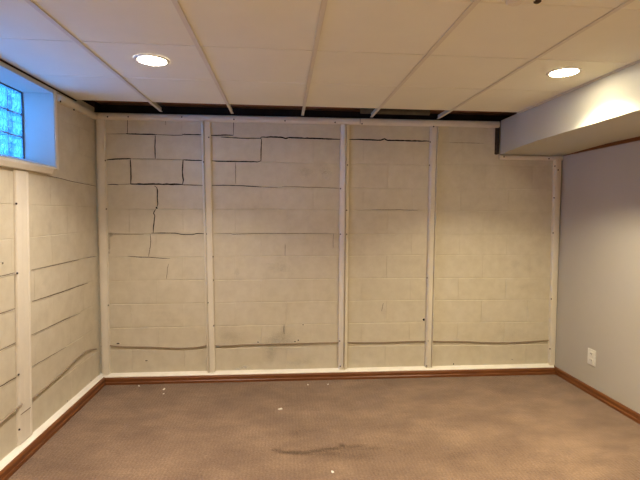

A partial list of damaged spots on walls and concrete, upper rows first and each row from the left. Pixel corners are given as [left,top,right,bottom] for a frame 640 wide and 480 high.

crack [47,120,429,279]
crack [32,256,96,270]
crack [32,283,87,302]